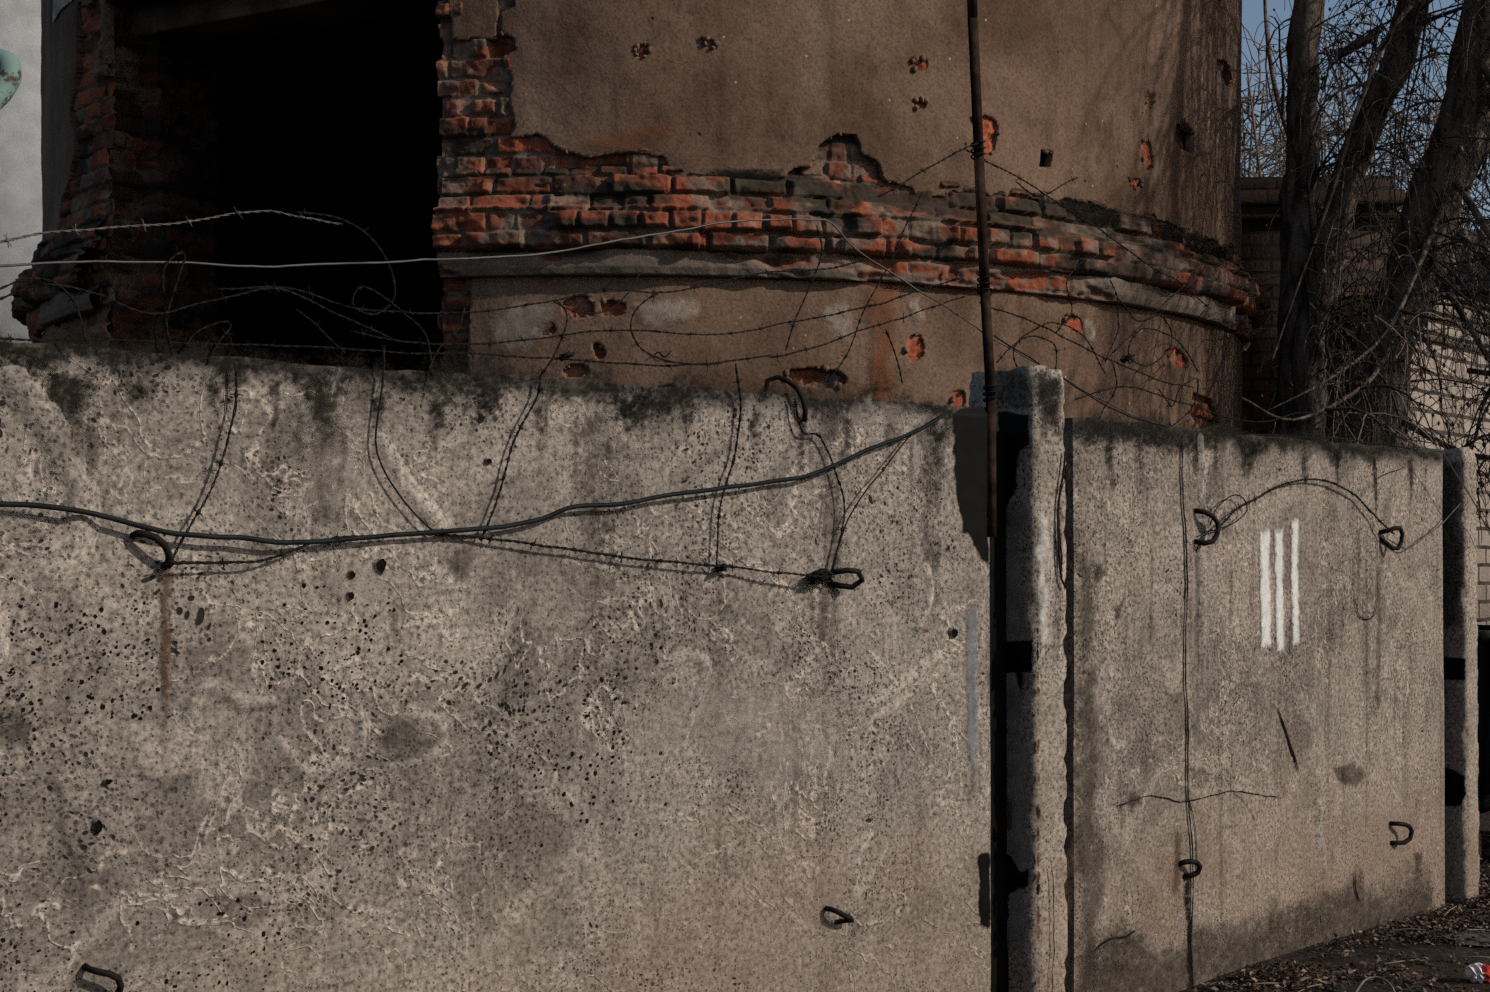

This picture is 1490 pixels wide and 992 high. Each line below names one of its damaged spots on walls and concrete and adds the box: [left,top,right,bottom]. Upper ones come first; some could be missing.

spalling [435,0,674,204]
spalling [52,0,117,348]
spalling [787,132,891,189]
spalling [971,113,1001,156]
spalling [1128,137,1155,191]
spalling [535,296,626,335]
spalling [1062,312,1085,334]
damp [0,325,975,492]
rust [159,569,174,712]